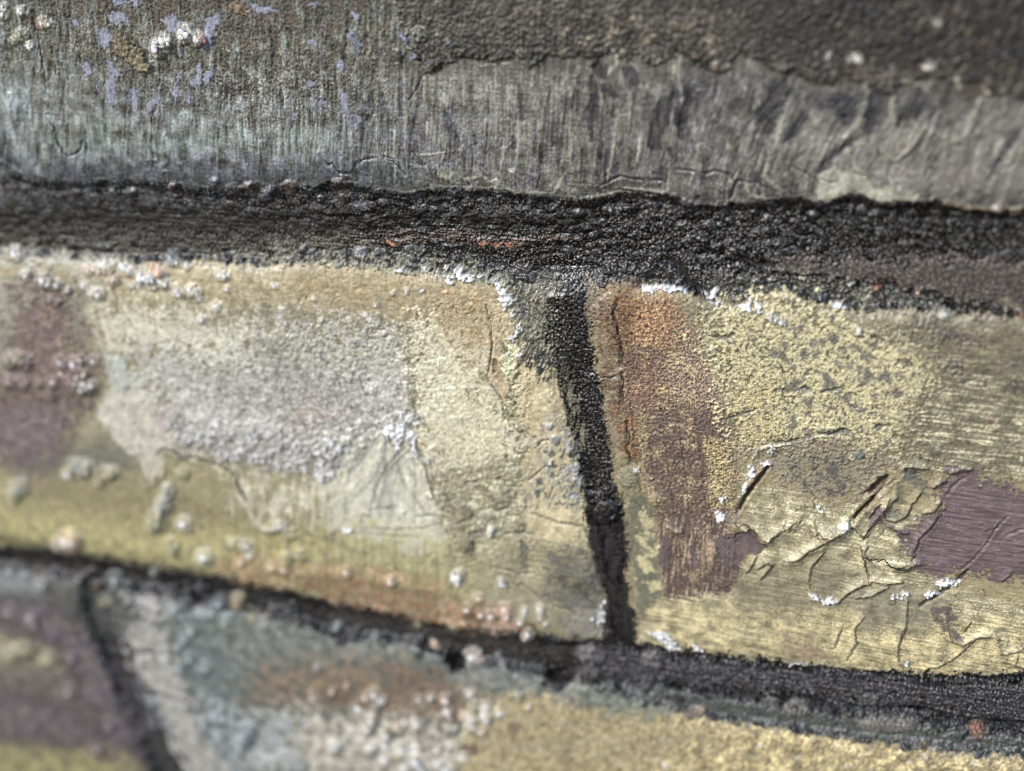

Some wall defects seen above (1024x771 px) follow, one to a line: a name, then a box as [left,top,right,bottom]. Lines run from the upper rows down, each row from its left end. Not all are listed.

corrosion [602,277,681,461]
leakage [168,409,343,483]
leakage [379,412,422,459]
peeling [657,535,673,570]
peeling [712,531,767,572]
crack [726,467,797,543]
crack [798,475,941,605]
peeling [869,465,1024,584]
crack [816,611,1018,686]